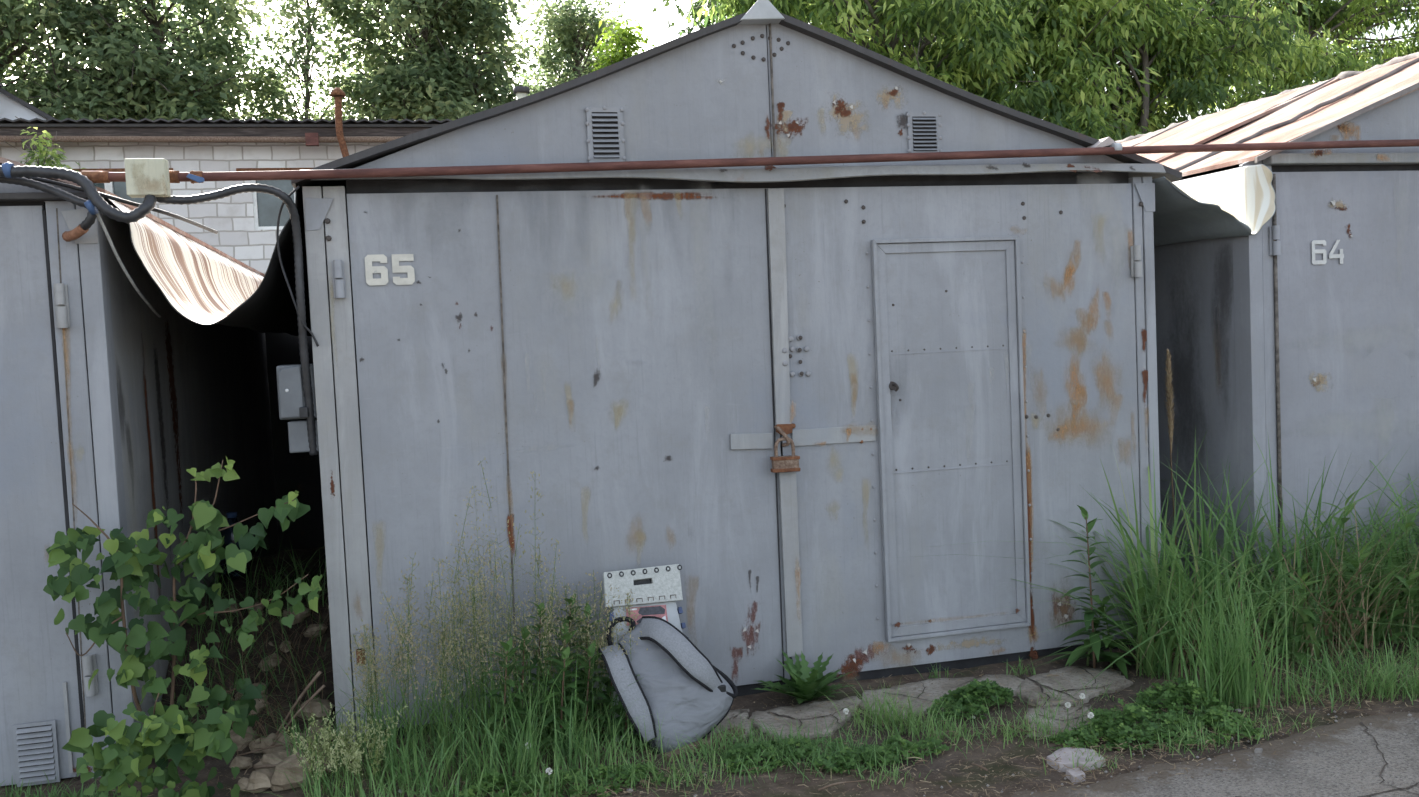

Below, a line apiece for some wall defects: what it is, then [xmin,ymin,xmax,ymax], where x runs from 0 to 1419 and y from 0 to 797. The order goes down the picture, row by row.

corrosion [772,102,806,138]
corrosion [598,192,712,200]
corrosion [1016,452,1038,660]
corrosion [837,644,884,678]
corrosion [903,638,1002,655]